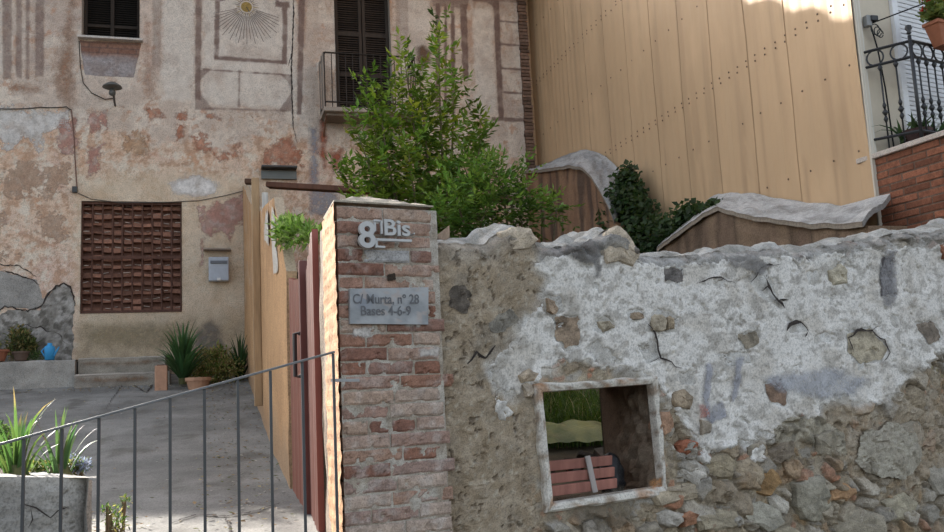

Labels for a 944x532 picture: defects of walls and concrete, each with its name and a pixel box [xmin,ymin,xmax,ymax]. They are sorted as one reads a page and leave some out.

flaking render [0,284,75,362]
flaking render [488,243,944,465]